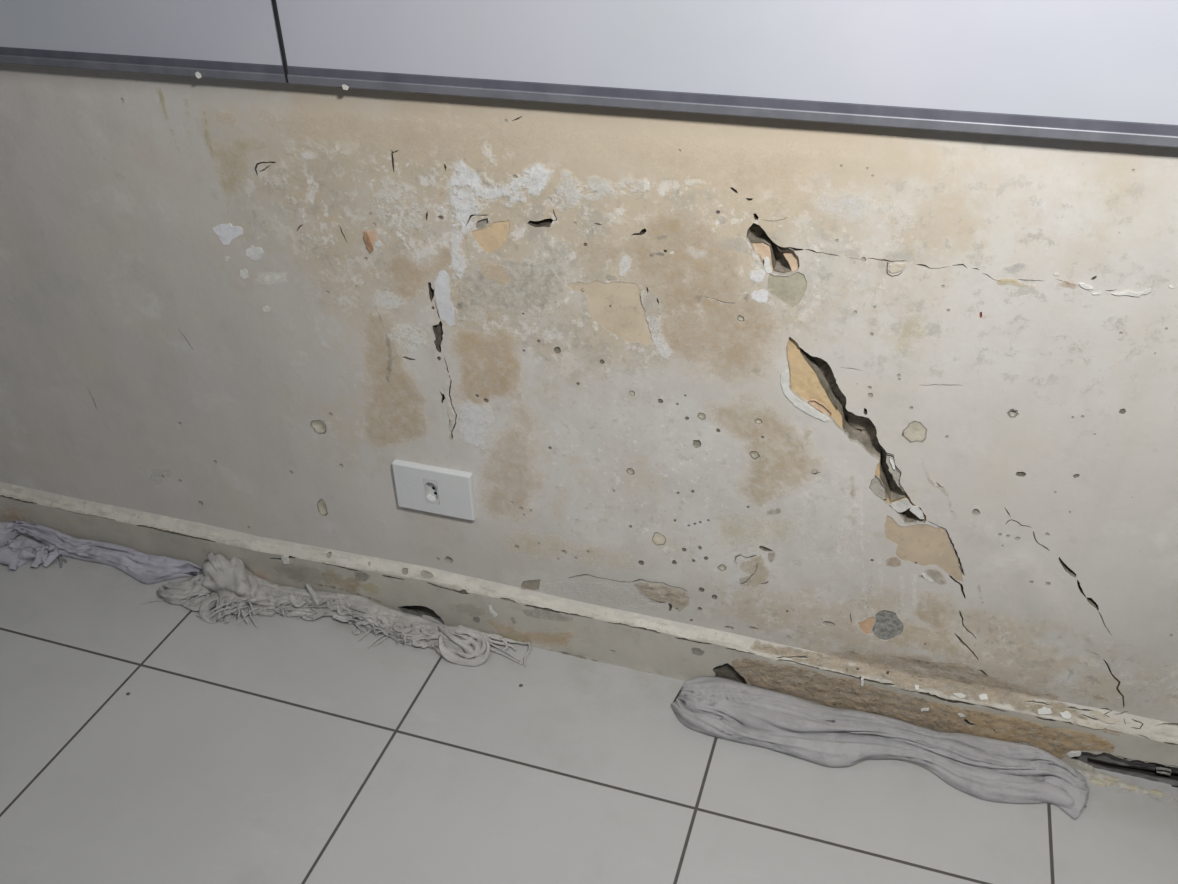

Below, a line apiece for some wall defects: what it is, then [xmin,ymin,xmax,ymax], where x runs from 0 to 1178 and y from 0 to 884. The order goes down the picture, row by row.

peeling [434,270,455,326]
peeling [527,200,557,227]
leakage [345,117,775,446]
spalling [730,187,807,308]
crack [805,249,1174,297]
crack [428,282,457,439]
leakage [716,405,821,514]
spalling [713,663,747,684]
crack [500,598,1007,712]
leakage [732,595,1116,758]
crack [1004,507,1124,733]
spalling [1066,751,1178,788]